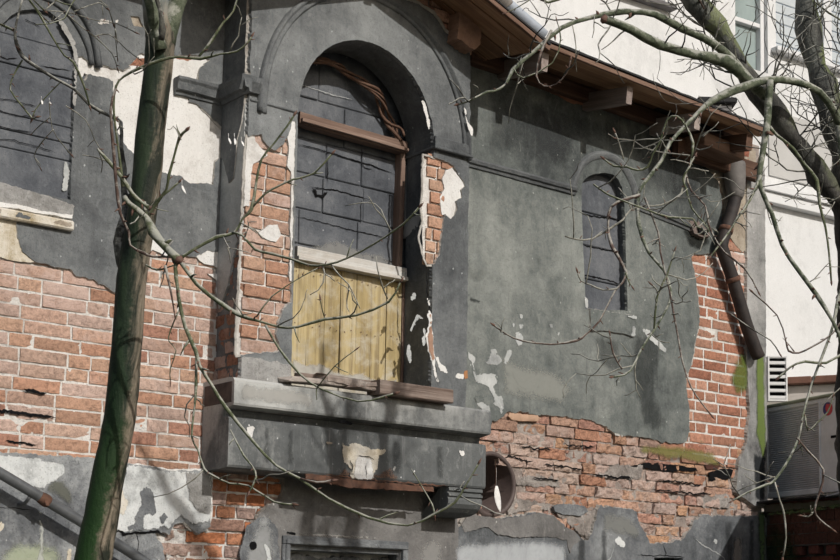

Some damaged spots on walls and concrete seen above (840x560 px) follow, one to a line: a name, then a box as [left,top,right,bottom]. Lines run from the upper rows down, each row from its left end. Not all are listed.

spalling [59,21,144,153]
spalling [403,153,464,267]
spalling [687,220,710,239]
spalling [706,167,728,218]
spalling [728,186,746,292]
spalling [744,148,759,163]
crack [0,389,56,418]
spalling [0,209,115,488]
spalling [117,55,296,560]
spalling [436,251,758,544]
spalling [342,442,386,480]